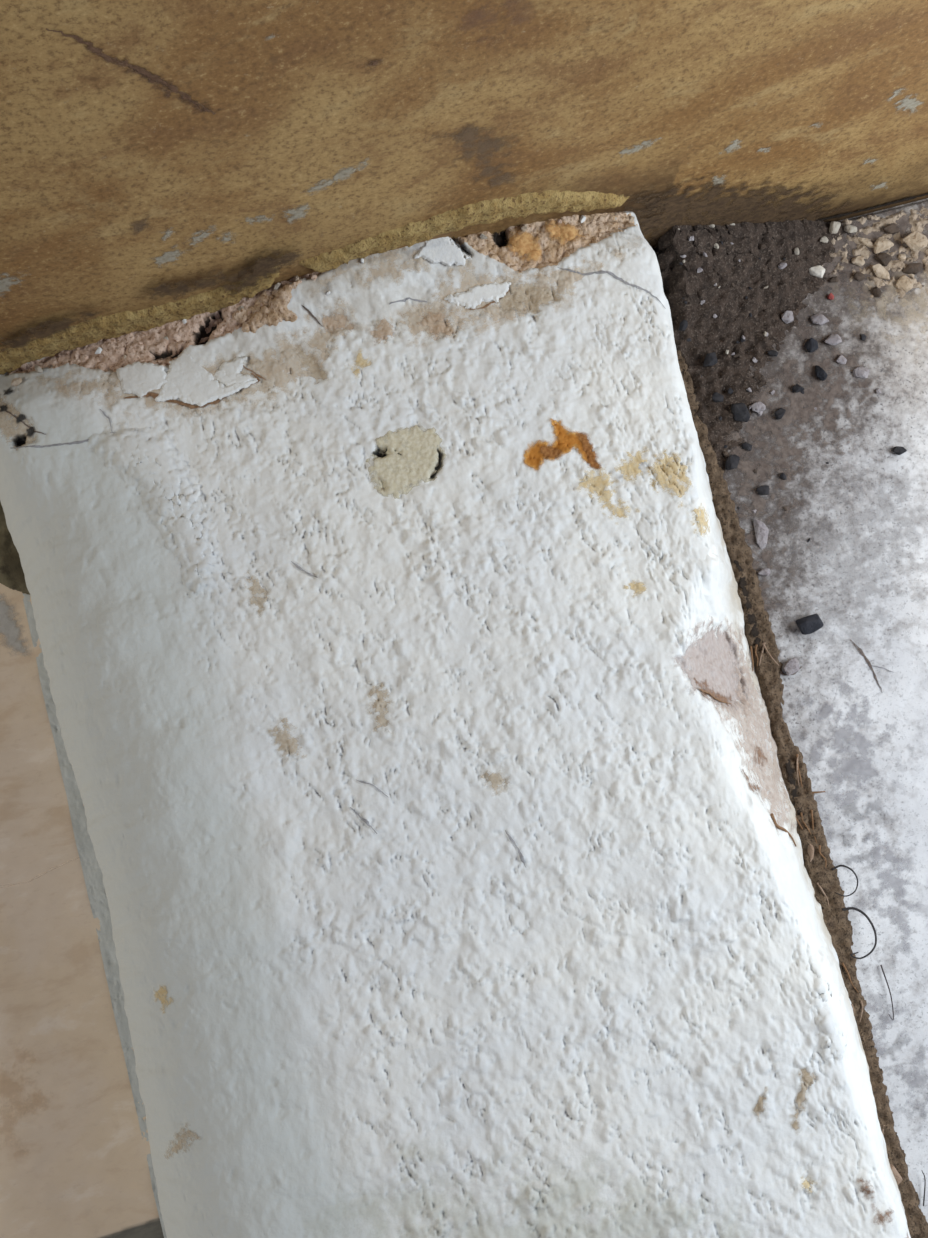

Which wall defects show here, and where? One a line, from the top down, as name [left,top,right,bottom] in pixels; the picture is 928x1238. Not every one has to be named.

crack [46,28,216,114]
leakage [150,251,302,299]
flaking render [414,212,638,340]
flaking render [0,272,327,449]
flaking render [351,353,370,375]
flaking render [371,319,393,343]
corrosion [524,419,691,517]
corrosion [693,508,708,534]